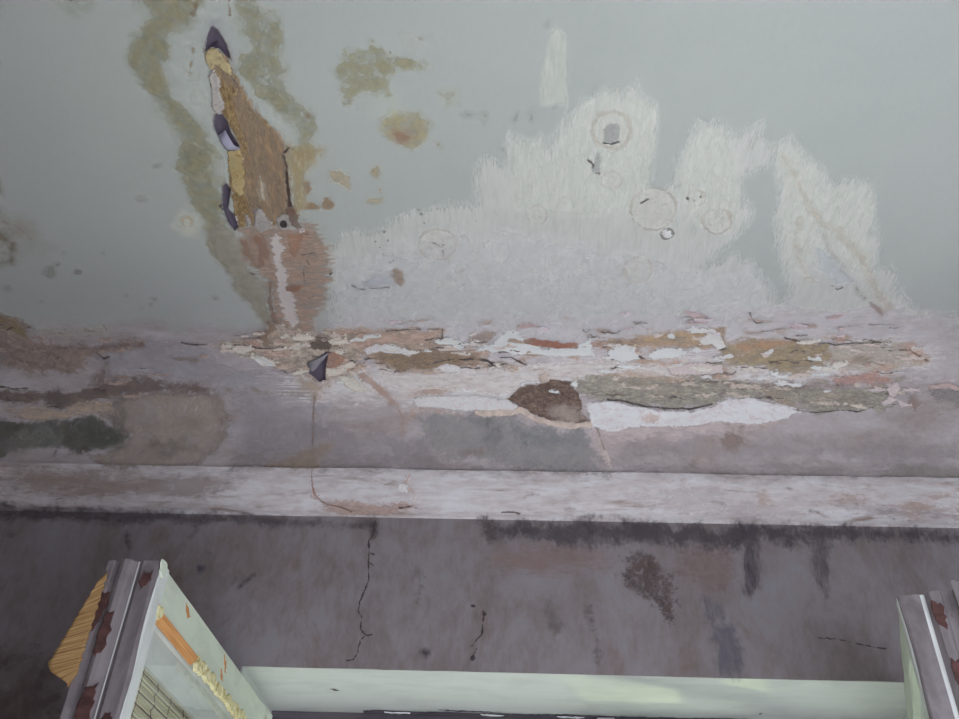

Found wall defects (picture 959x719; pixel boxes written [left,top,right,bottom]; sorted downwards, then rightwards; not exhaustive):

damp [128,0,274,324]
peeling [203,47,320,234]
damp [228,0,316,147]
damp [0,313,229,469]
crack [311,394,353,513]
spalling [181,311,959,441]
crack [346,520,377,661]
mould [623,552,681,621]
damp [739,523,759,595]